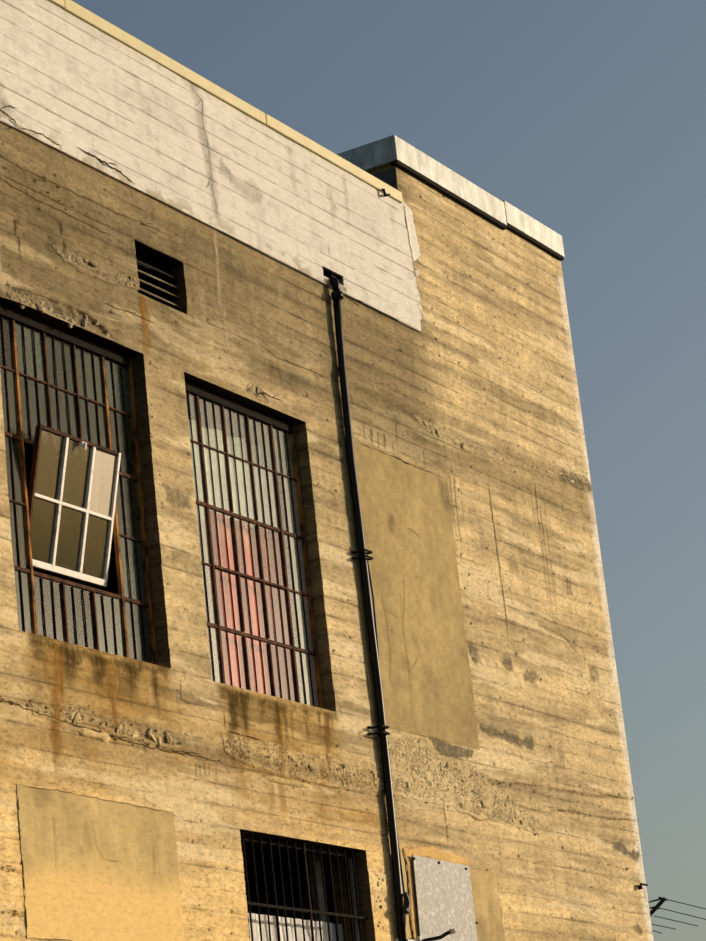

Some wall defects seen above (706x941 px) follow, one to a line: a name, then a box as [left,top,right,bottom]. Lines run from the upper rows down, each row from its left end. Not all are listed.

crack [0,105,135,184]
crack [191,83,218,217]
crack [0,155,163,235]
spalling [0,283,119,343]
leakage [96,654,143,689]
spalling [0,696,183,750]
spalling [221,732,547,836]